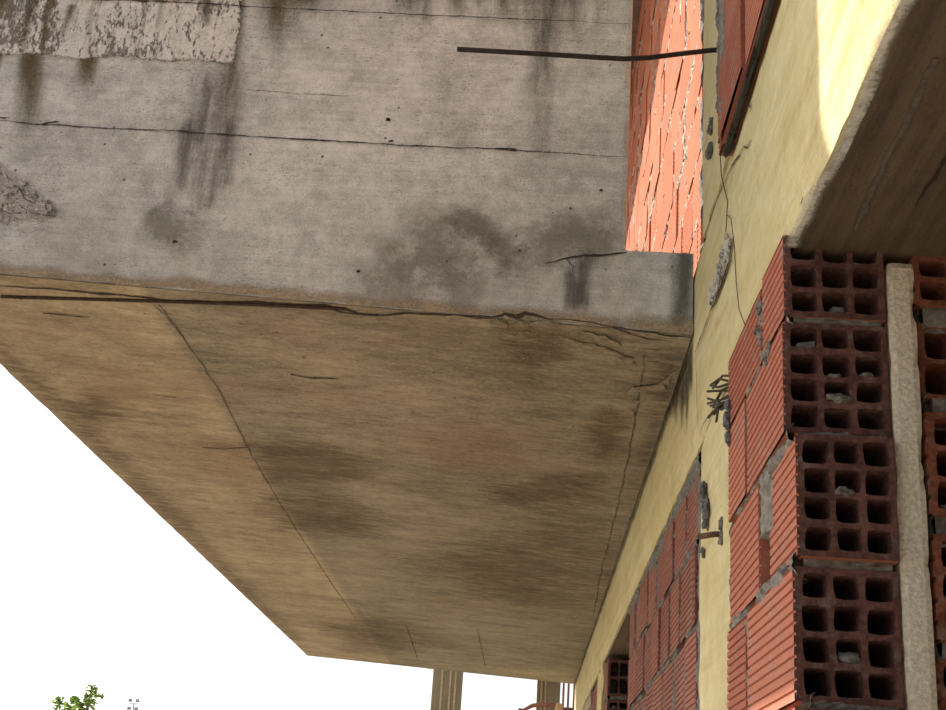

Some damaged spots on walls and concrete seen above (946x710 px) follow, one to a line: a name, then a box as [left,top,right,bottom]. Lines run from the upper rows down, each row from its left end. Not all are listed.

spalling [0,0,242,64]
leakage [269,0,290,30]
leakage [179,79,210,180]
crack [0,117,622,157]
leakage [386,225,475,289]
leakage [539,220,609,307]
crack [545,252,627,275]
spalling [707,232,733,310]
crack [4,286,496,618]
crack [547,260,732,616]